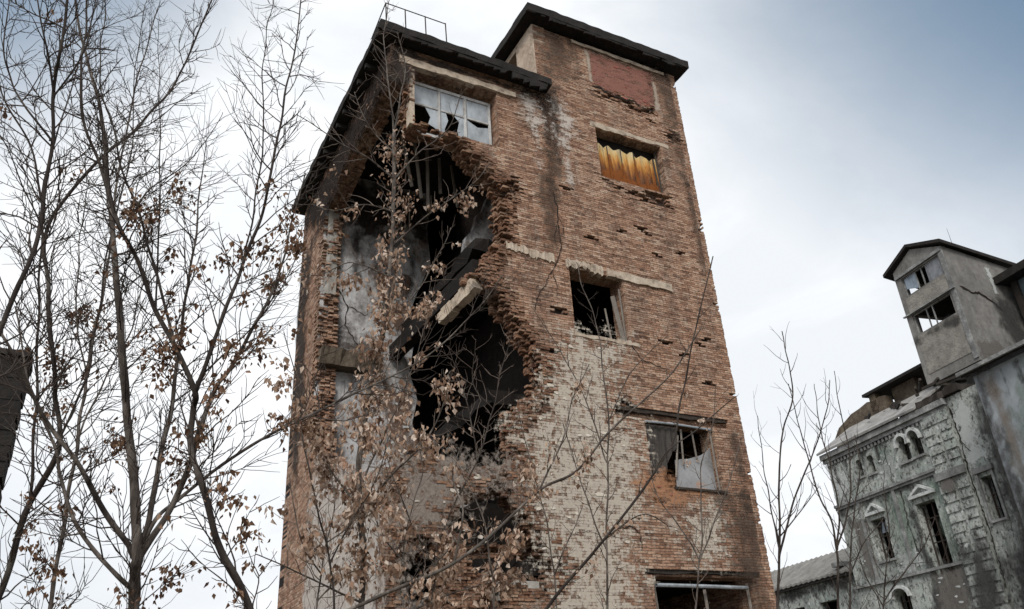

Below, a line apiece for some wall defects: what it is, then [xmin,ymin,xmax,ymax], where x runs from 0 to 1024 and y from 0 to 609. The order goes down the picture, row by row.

spalling [496,182,521,212]
leakage [518,86,575,245]
spalling [616,187,667,208]
crack [961,286,996,304]
peeling [302,308,733,609]
leakage [826,427,923,483]
leakage [839,476,944,609]
leakage [960,382,1024,609]